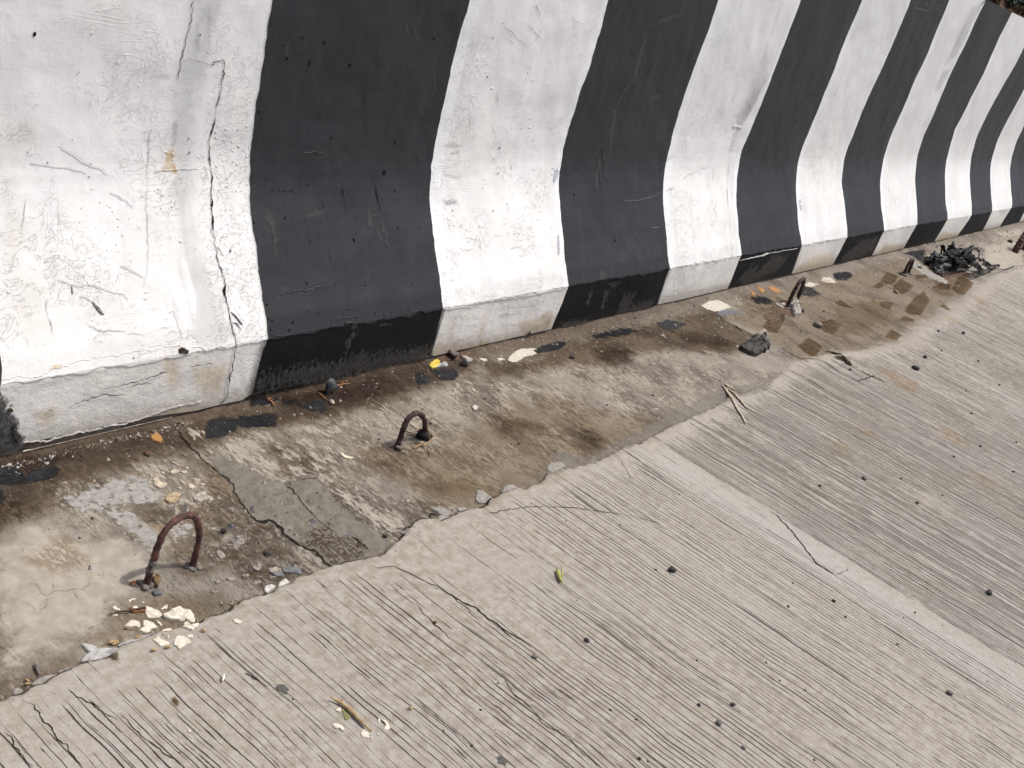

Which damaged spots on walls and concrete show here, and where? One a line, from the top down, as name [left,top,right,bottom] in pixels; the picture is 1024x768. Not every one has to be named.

crack [178,2,242,406]
crack [12,372,167,441]
crack [178,430,532,648]
crack [777,516,848,574]